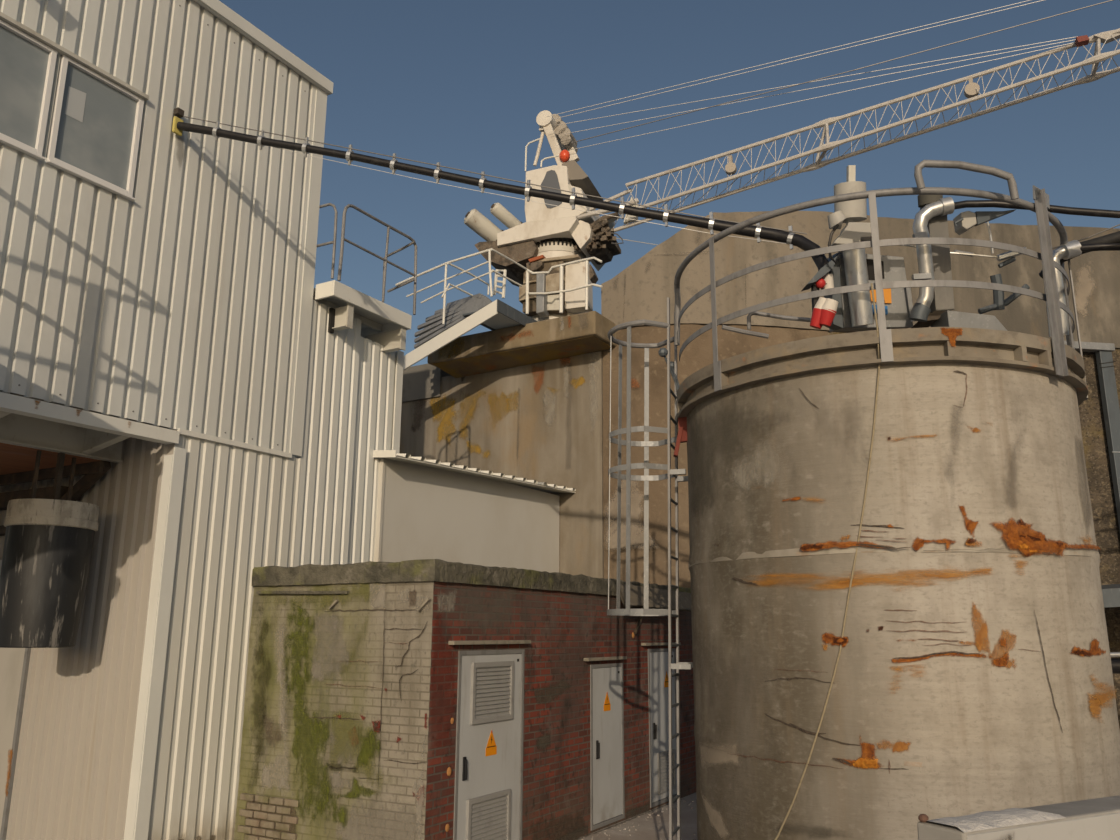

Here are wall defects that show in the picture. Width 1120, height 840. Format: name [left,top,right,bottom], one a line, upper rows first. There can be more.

peeling [430,392,518,457]
rust [800,506,1100,568]
rust [732,568,991,589]
rust [822,633,848,650]
rust [867,605,1041,668]
rust [1071,639,1106,656]
crack [312,609,427,781]
rust [1089,679,1116,717]
rust [733,741,910,774]